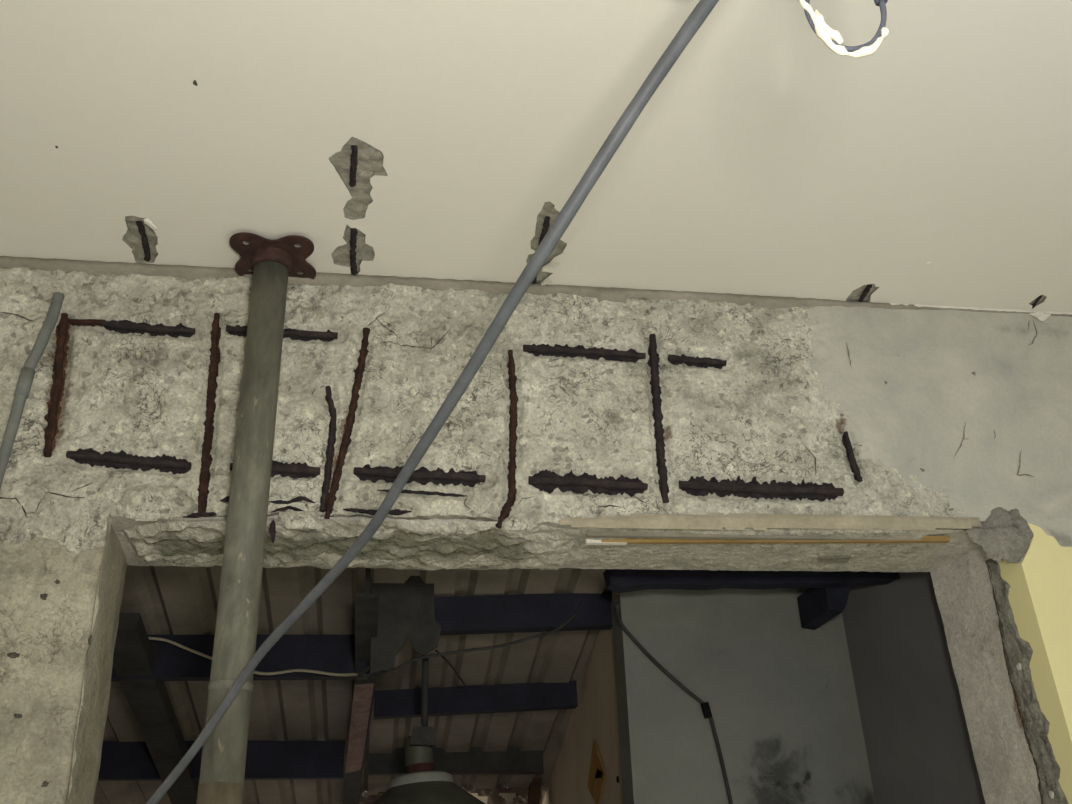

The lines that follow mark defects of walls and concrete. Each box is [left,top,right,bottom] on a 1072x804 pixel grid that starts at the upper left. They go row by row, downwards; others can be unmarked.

crack [0,482,93,520]
spalling [0,216,253,804]
spalling [263,137,1072,571]
spalling [985,559,1068,804]